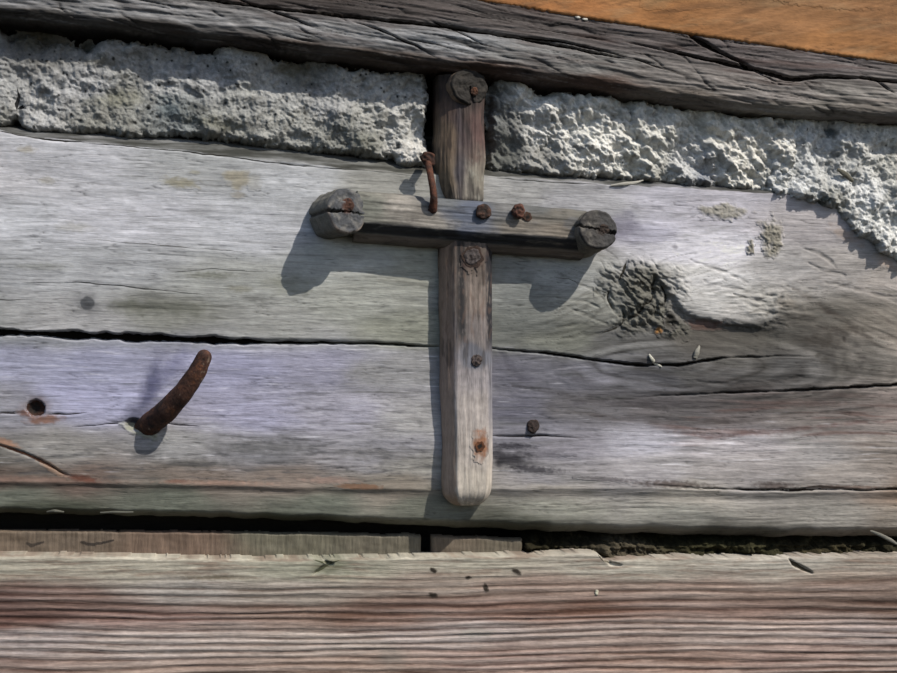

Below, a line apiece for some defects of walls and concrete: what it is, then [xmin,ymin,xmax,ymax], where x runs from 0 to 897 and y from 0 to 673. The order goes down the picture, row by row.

crack [196,0,897,93]
crack [602,261,666,333]
crack [0,329,435,347]
crack [493,348,771,366]
crack [650,383,897,397]
corrosion [470,426,489,464]